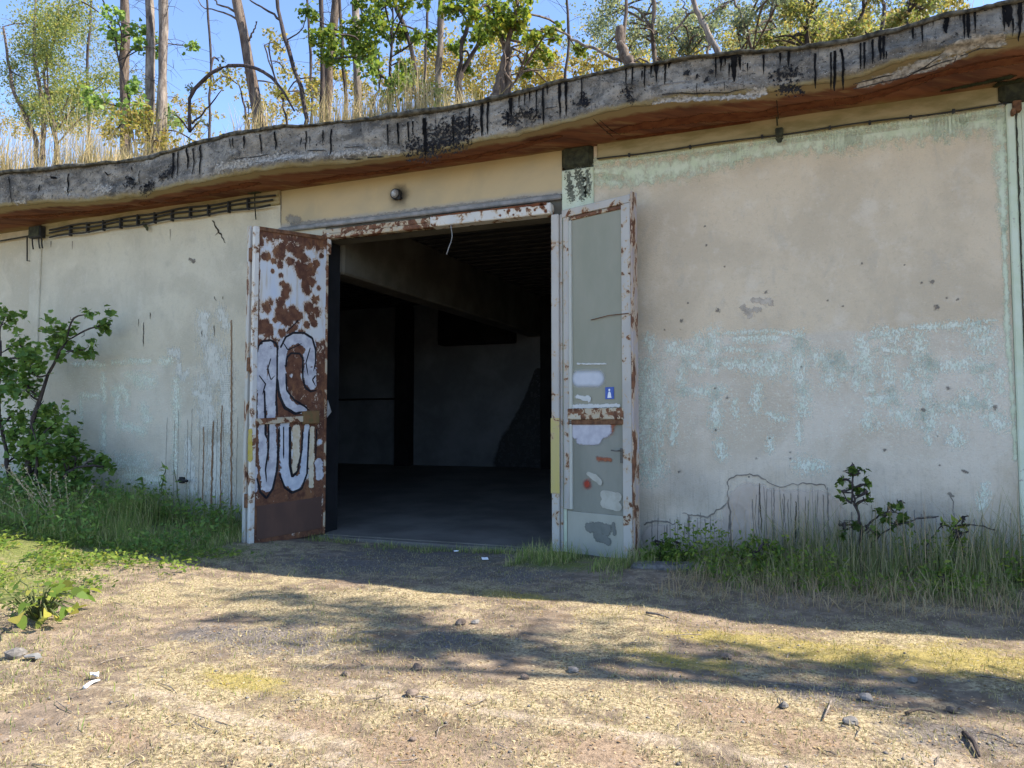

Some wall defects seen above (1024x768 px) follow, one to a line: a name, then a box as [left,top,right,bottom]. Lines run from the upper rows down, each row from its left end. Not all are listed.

water stain [912,12,976,42]
water stain [1002,2,1023,41]
water stain [625,62,671,88]
water stain [715,55,748,82]
water stain [830,48,845,91]
water stain [859,36,887,69]
water stain [468,102,489,137]
water stain [507,82,568,127]
water stain [171,145,202,178]
rust [431,202,547,217]
rust [202,320,233,512]
crack [644,473,827,548]